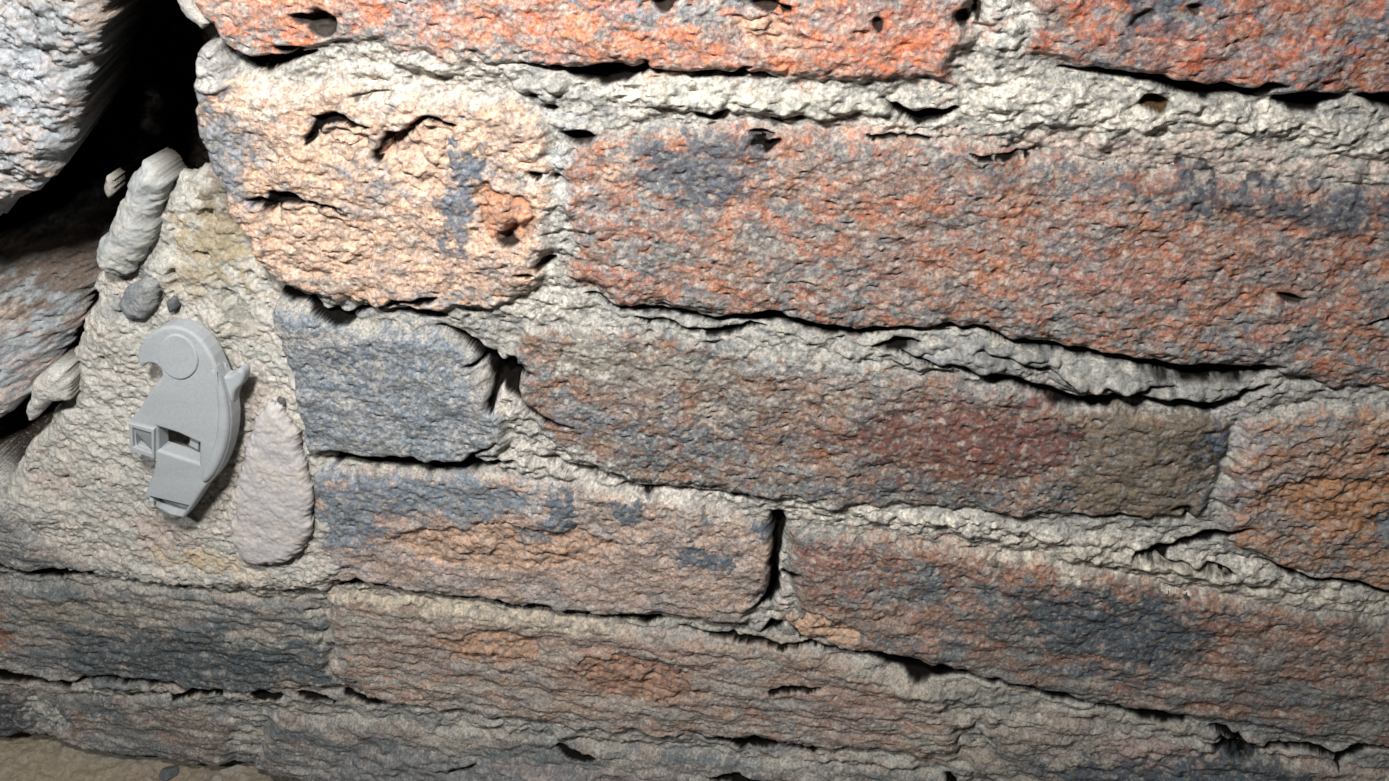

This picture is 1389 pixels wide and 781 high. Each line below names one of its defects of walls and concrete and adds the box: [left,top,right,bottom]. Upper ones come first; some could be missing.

crack [304,90,456,163]
crack [282,285,664,494]
crack [589,291,1270,410]
crack [341,577,366,585]
crack [495,488,1382,771]
crack [693,731,817,781]